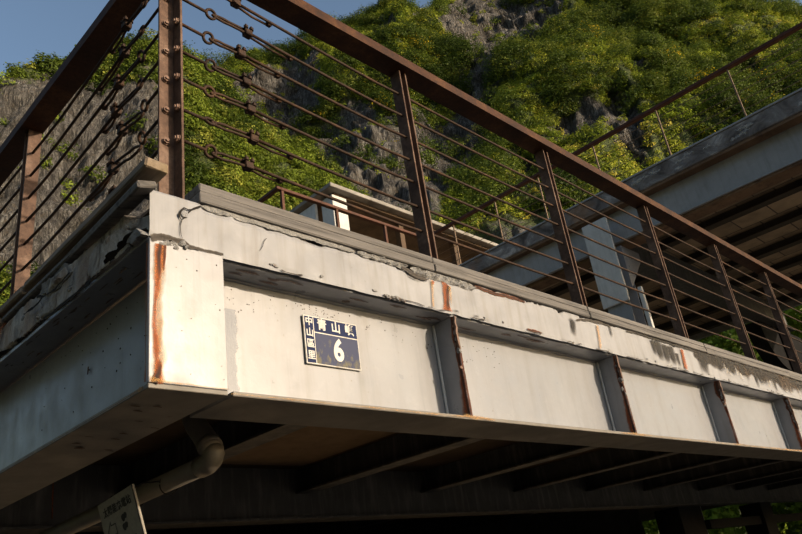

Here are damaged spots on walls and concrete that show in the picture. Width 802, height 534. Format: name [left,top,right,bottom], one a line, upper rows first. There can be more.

crack [178,206,201,239]
spalling [7,219,223,344]
corrosion [1,242,493,472]
corrosion [613,355,667,438]
corrosion [714,380,802,451]